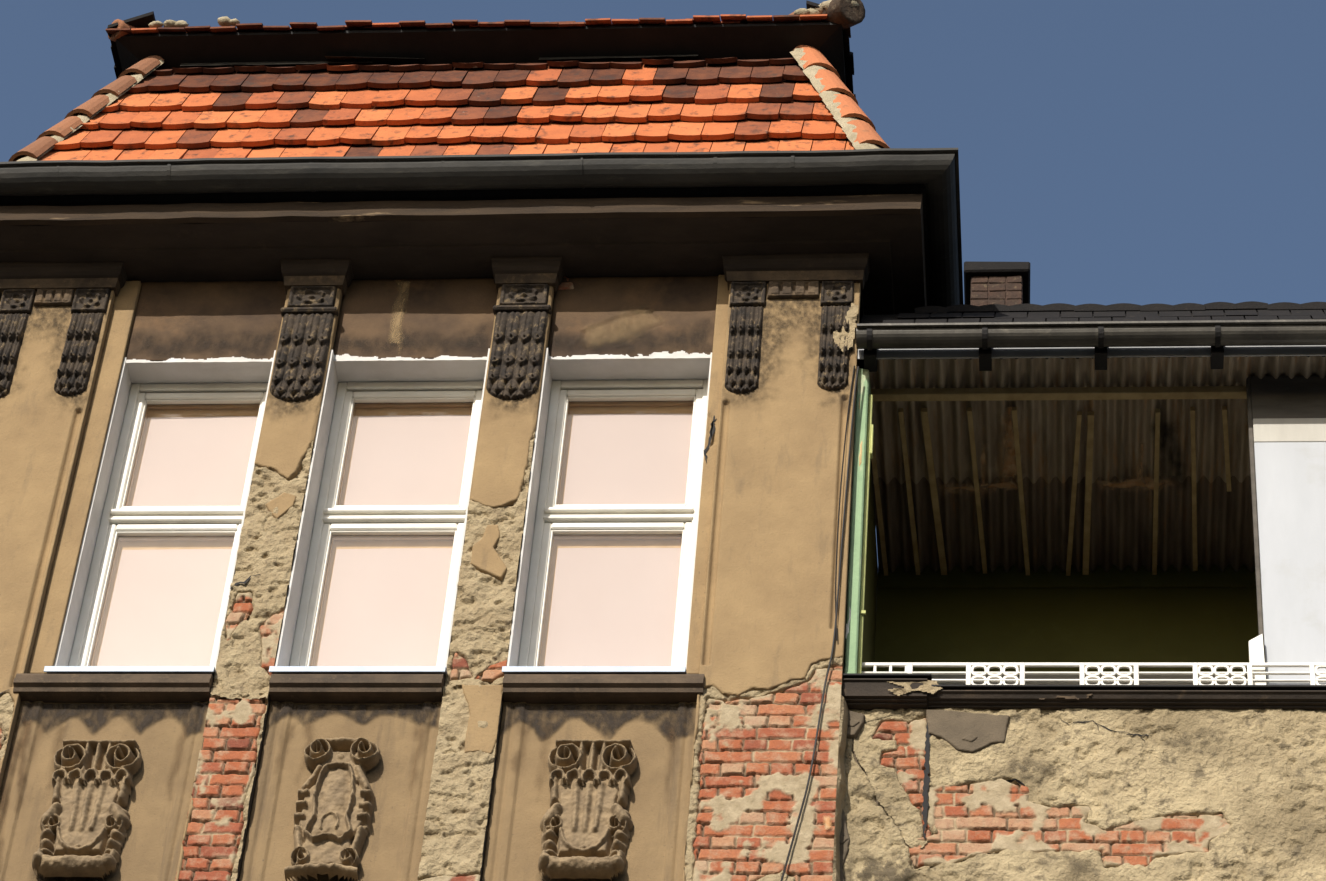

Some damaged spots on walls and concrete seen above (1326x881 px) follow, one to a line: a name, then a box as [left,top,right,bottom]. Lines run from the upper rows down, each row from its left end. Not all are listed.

flaking render [0,693,14,760]
flaking render [175,440,313,881]
spalling [418,432,535,881]
flaking render [684,657,1231,881]